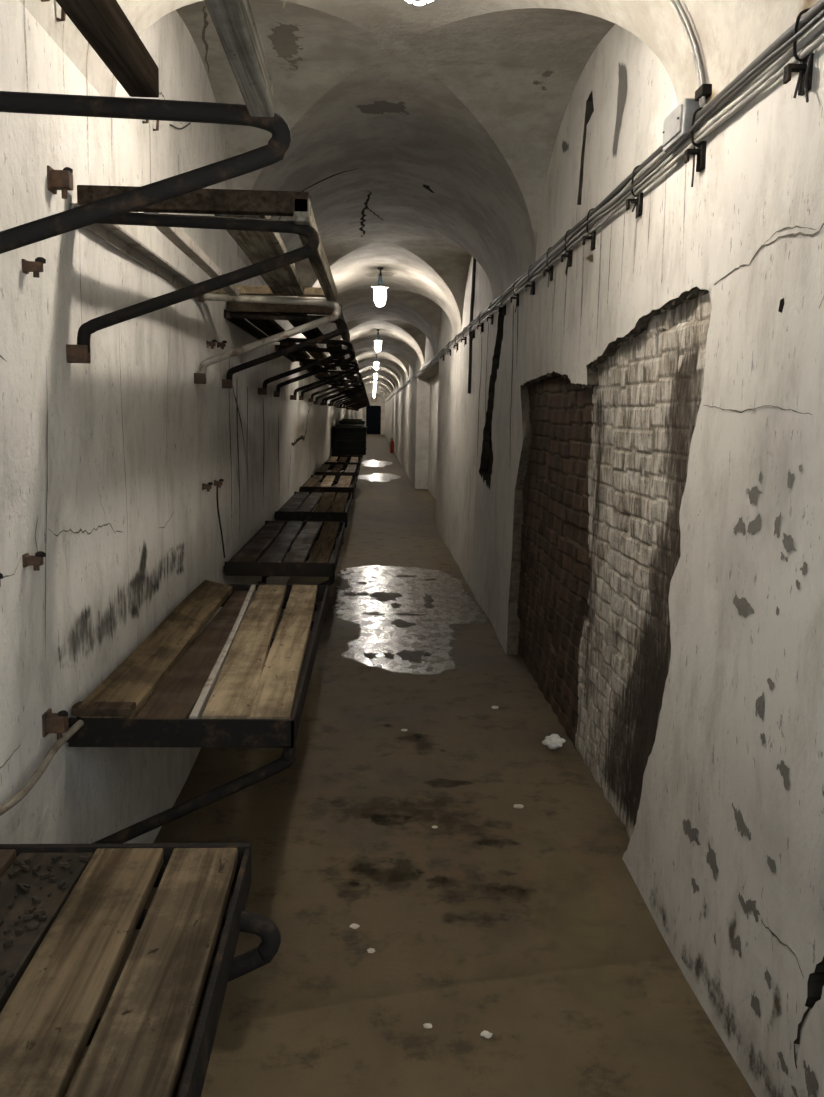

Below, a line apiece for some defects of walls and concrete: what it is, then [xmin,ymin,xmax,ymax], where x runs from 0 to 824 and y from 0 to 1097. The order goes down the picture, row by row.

crack [714,223,824,285]
peeling [734,472,762,536]
spalling [507,286,712,838]
peeling [774,512,796,562]
peeling [733,595,754,618]
peeling [755,678,774,747]
peeling [777,760,790,791]
peeling [683,818,719,880]
peeling [732,803,751,840]
peeling [738,892,760,923]
crack [761,920,824,1069]
peeling [777,1052,818,1097]